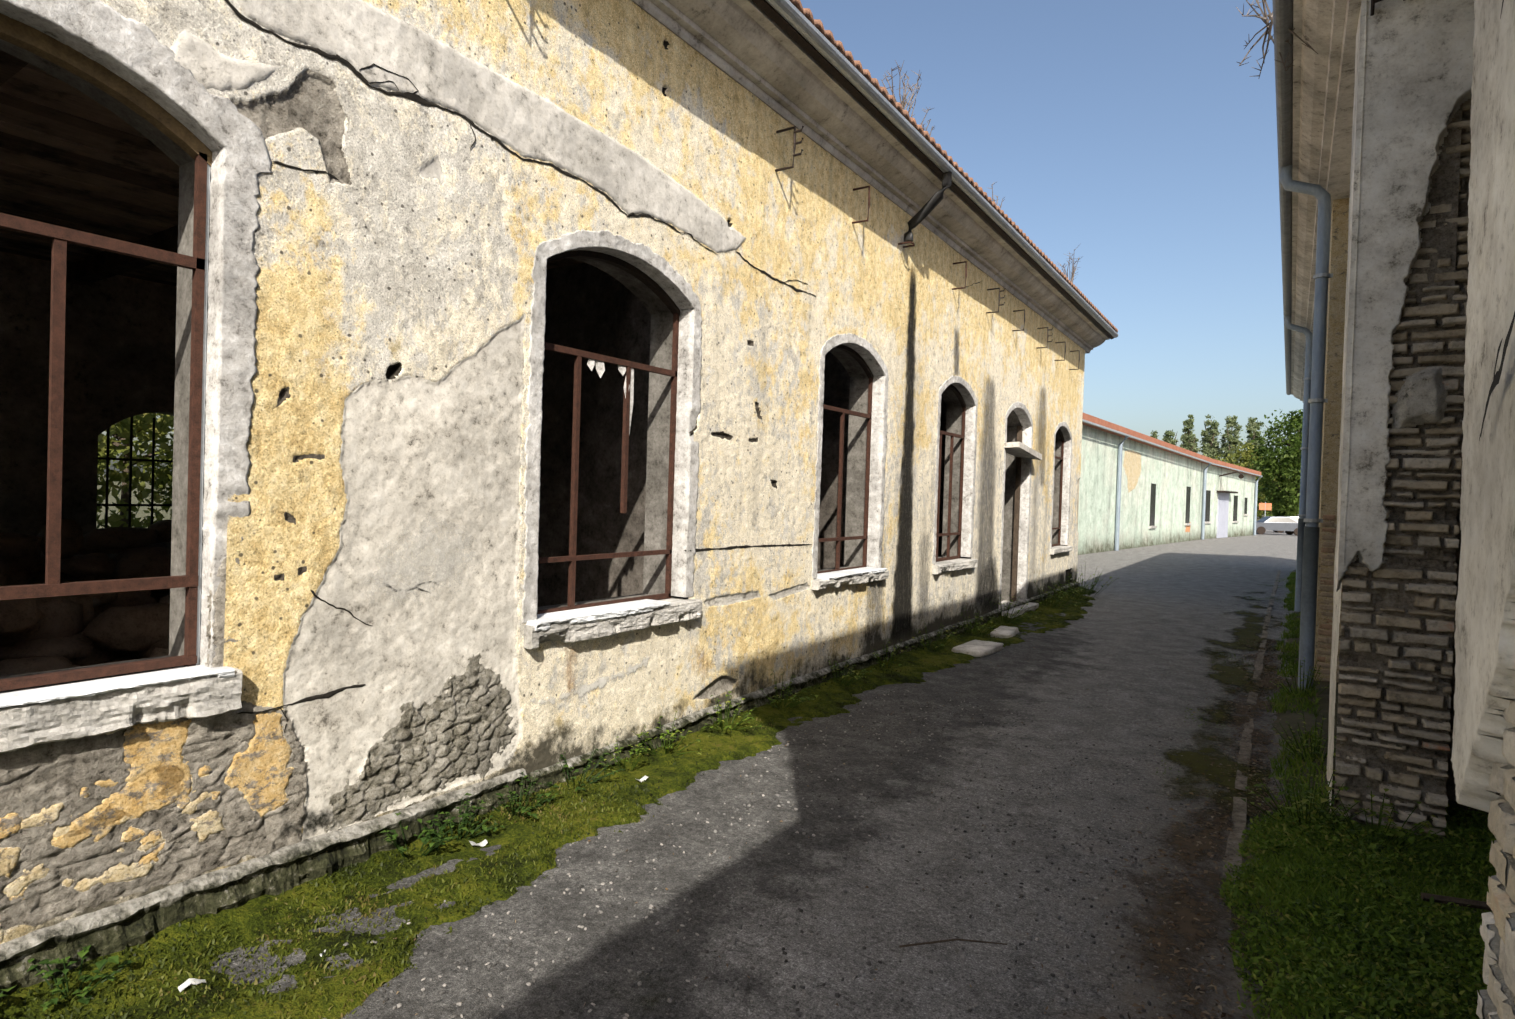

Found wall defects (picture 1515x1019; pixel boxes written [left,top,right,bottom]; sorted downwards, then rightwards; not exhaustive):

crack [225,0,815,296]
peeling [0,314,526,942]
crack [237,684,366,732]
water stain [867,269,936,639]
spalling [1316,98,1472,838]
spalling [1476,699,1515,1019]